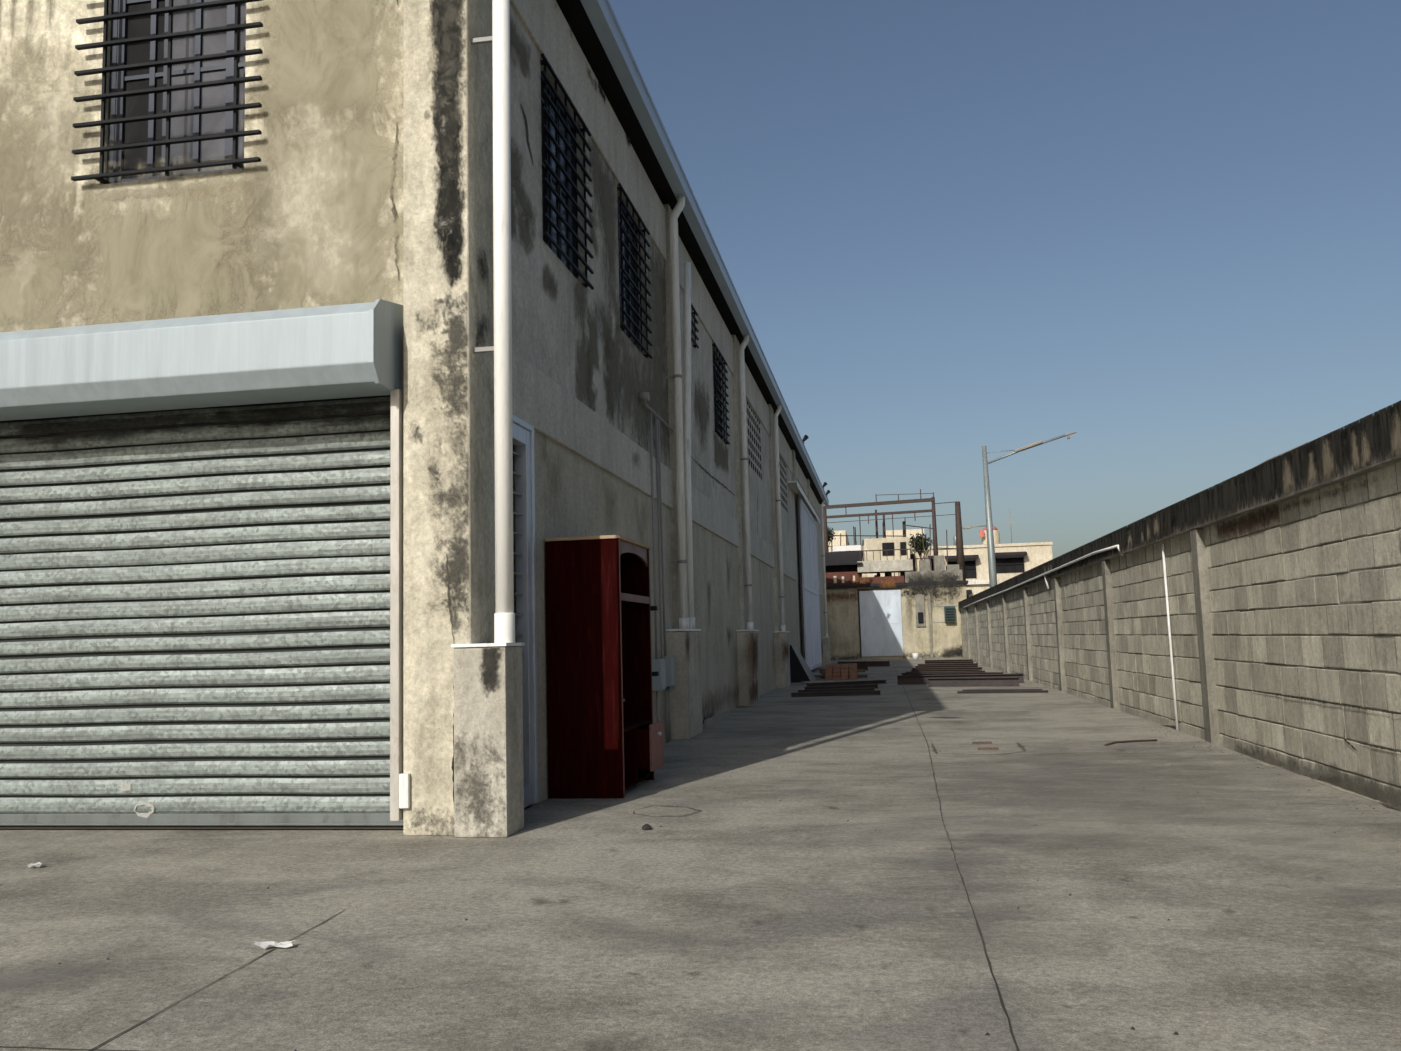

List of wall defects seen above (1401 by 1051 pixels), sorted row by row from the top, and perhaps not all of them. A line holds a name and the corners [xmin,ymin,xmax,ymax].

water stain [510,23,529,76]
water stain [511,143,534,252]
water stain [417,0,488,633]
water stain [575,139,670,458]
water stain [901,400,1401,613]
water stain [481,648,501,692]
water stain [454,743,504,837]